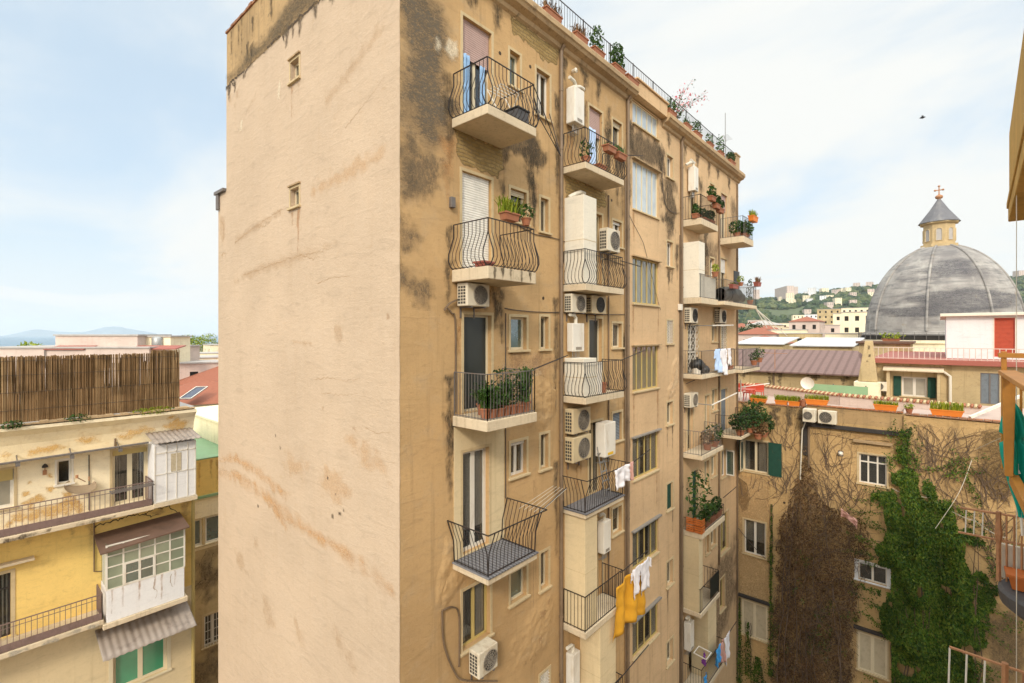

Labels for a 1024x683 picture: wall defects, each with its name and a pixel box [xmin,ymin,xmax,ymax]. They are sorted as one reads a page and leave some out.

leakage [226,0,317,96]
flaking render [511,17,559,65]
flaking render [456,130,503,179]
leakage [502,95,559,223]
peeling [6,475,81,527]